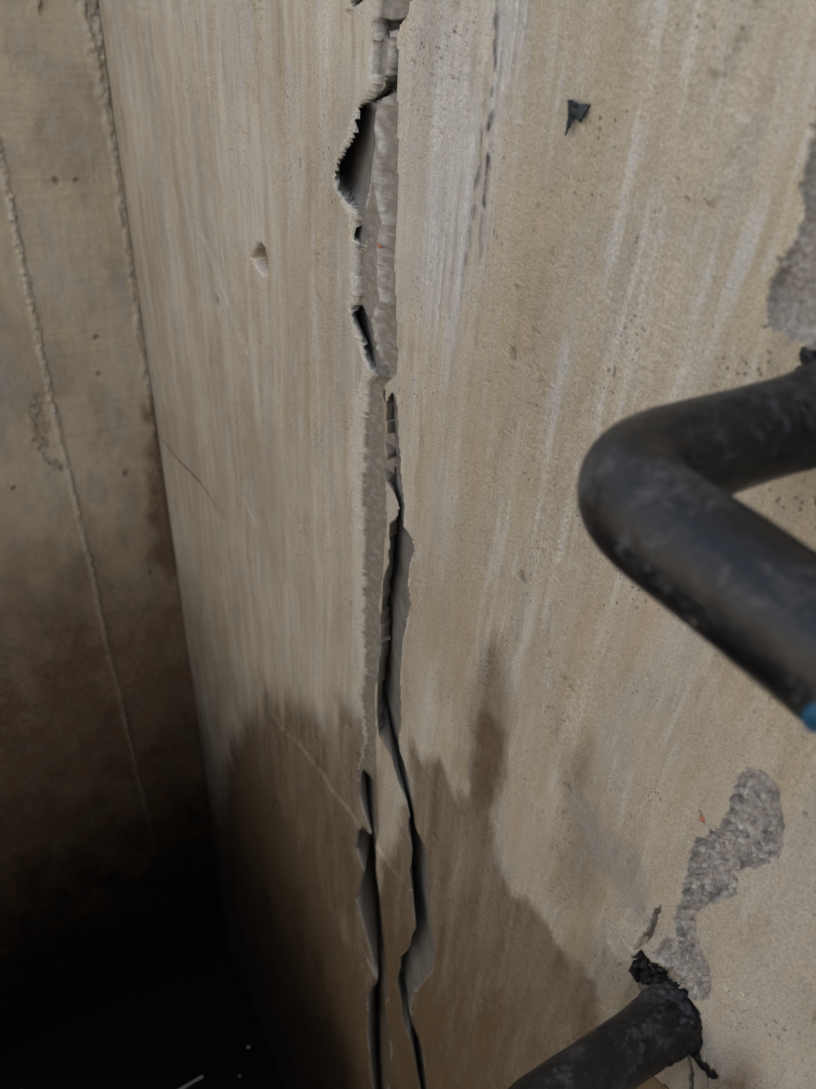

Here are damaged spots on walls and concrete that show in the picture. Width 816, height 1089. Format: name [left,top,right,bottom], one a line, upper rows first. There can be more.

spalling [763,130,816,350]
crack [332,0,435,1089]
peeling [606,768,785,1002]